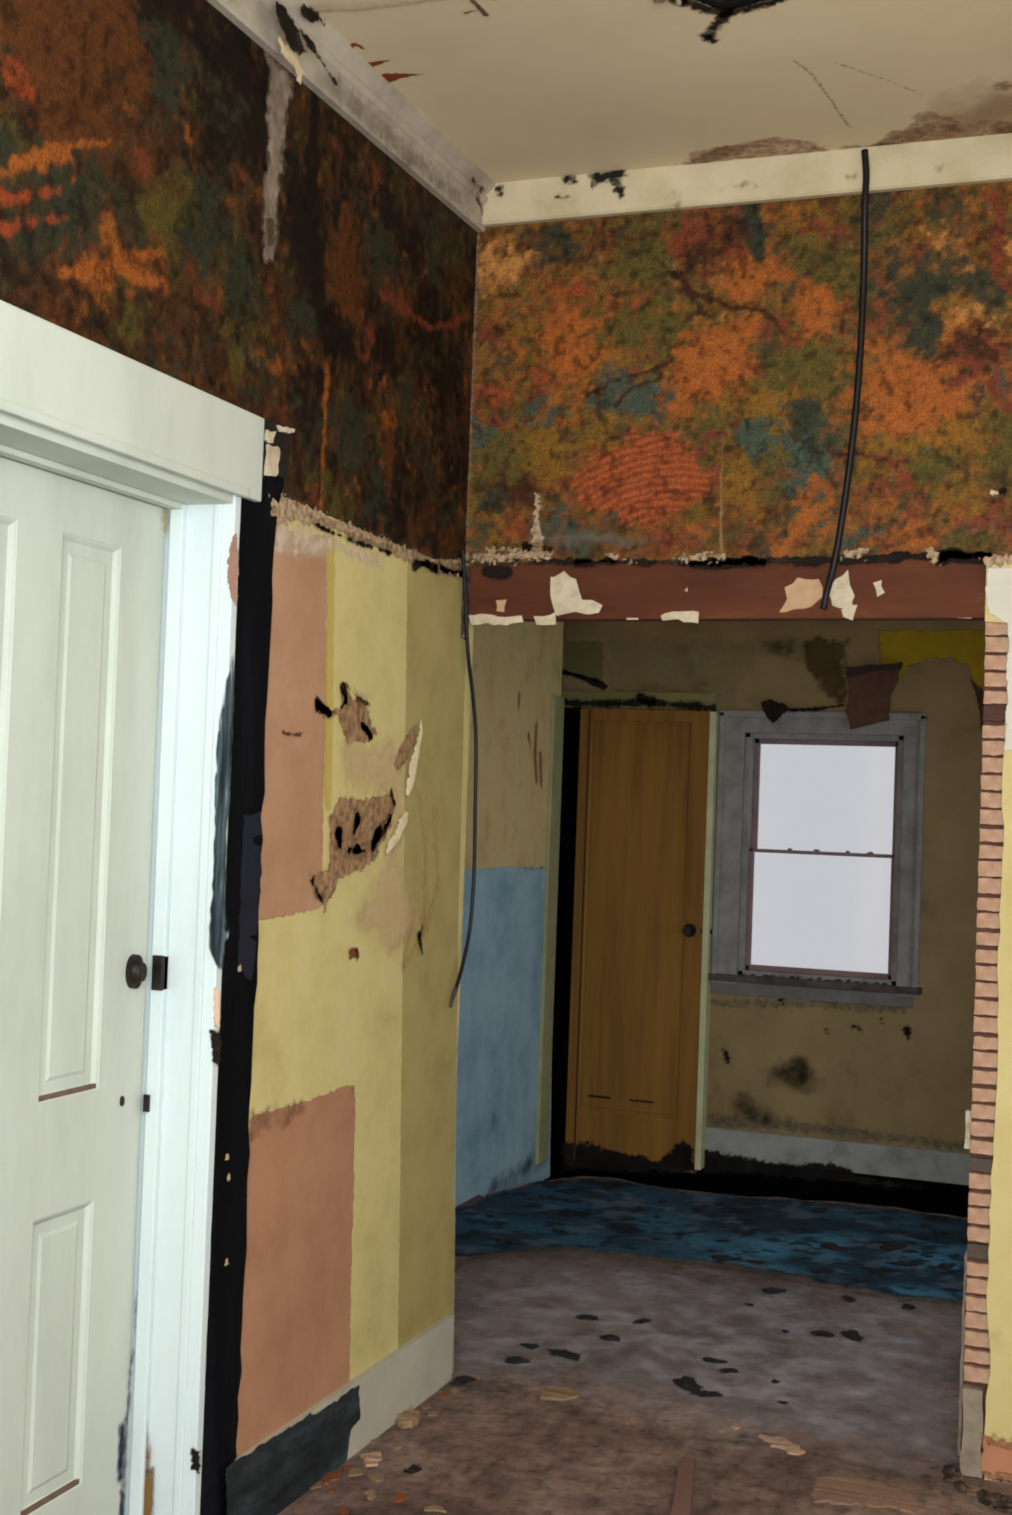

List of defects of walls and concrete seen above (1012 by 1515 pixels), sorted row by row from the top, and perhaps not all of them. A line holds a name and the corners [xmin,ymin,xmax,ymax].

spalling [555,170,627,198]
spalling [672,551,726,564]
spalling [841,548,870,562]
spalling [925,546,941,566]
flaking render [979,553,1012,751]
flaking render [259,419,554,920]